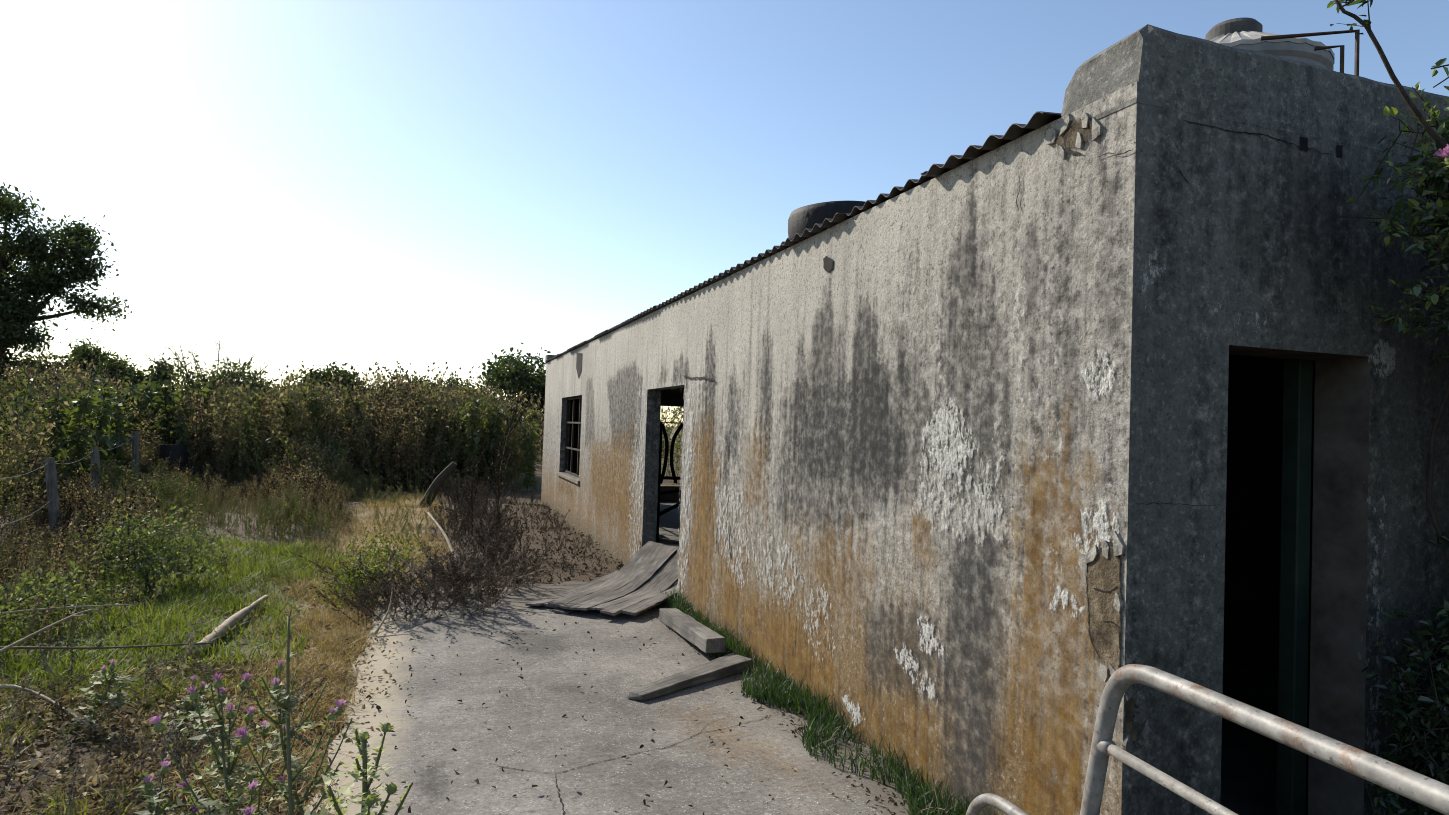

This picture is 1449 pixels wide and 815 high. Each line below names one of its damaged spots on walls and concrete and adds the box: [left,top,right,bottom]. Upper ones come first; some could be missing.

water stain [608,367,643,452]
water stain [757,234,995,527]
water stain [957,351,1008,502]
corrosion [1009,449,1093,815]
flaking render [1044,437,1126,682]
crack [488,716,770,815]
flaking render [1122,684,1149,752]